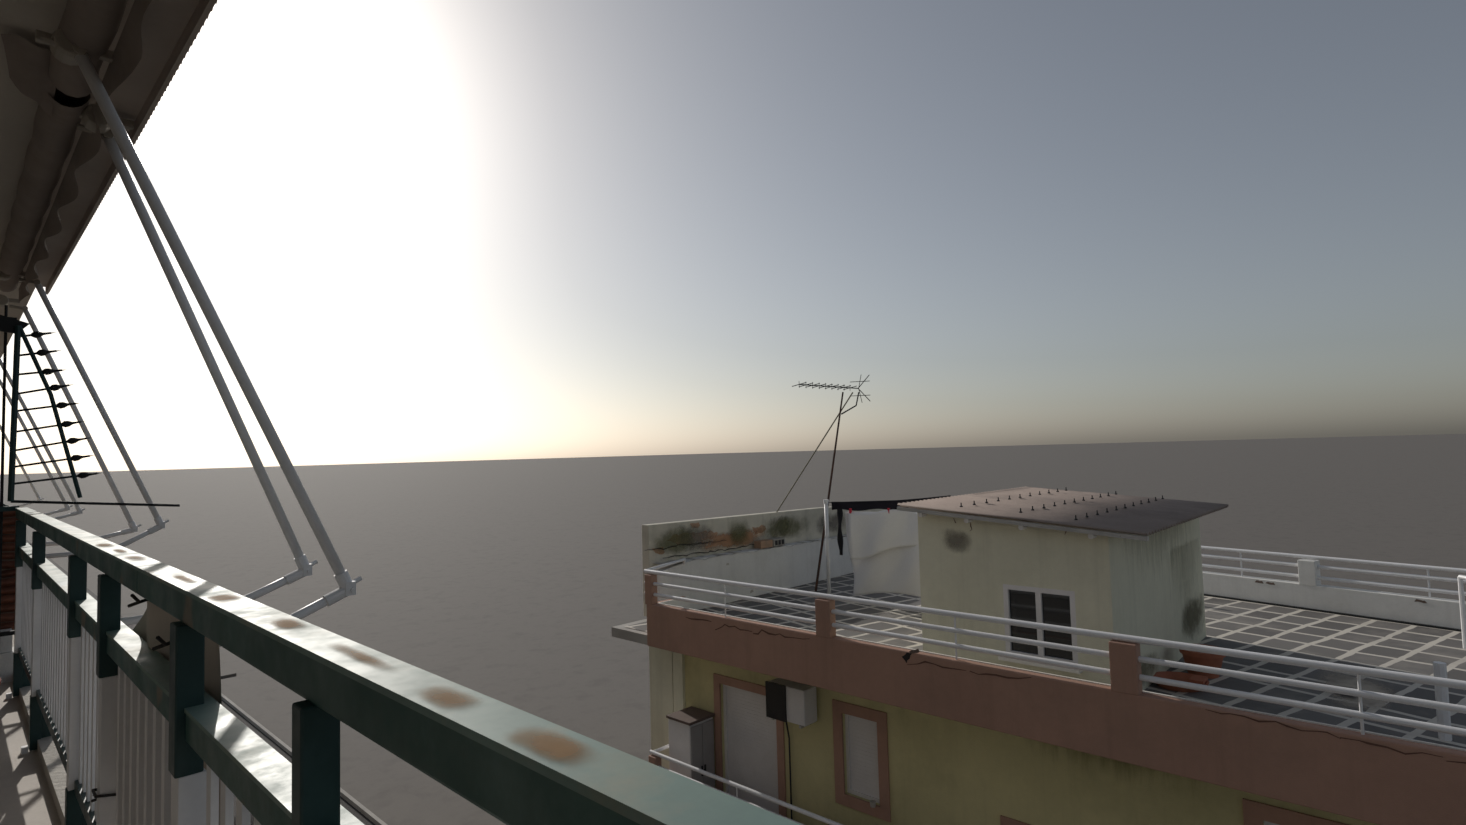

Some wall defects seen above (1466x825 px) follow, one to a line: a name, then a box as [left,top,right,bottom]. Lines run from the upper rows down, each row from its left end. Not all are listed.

leakage [660,519,800,551]
corrosion [275,619,301,628]
crack [686,617,810,639]
leakage [1184,594,1462,632]
corrosion [340,647,379,663]
crack [907,661,1031,679]
corrosion [428,690,468,705]
corrosion [523,734,581,758]
crack [1205,709,1466,764]